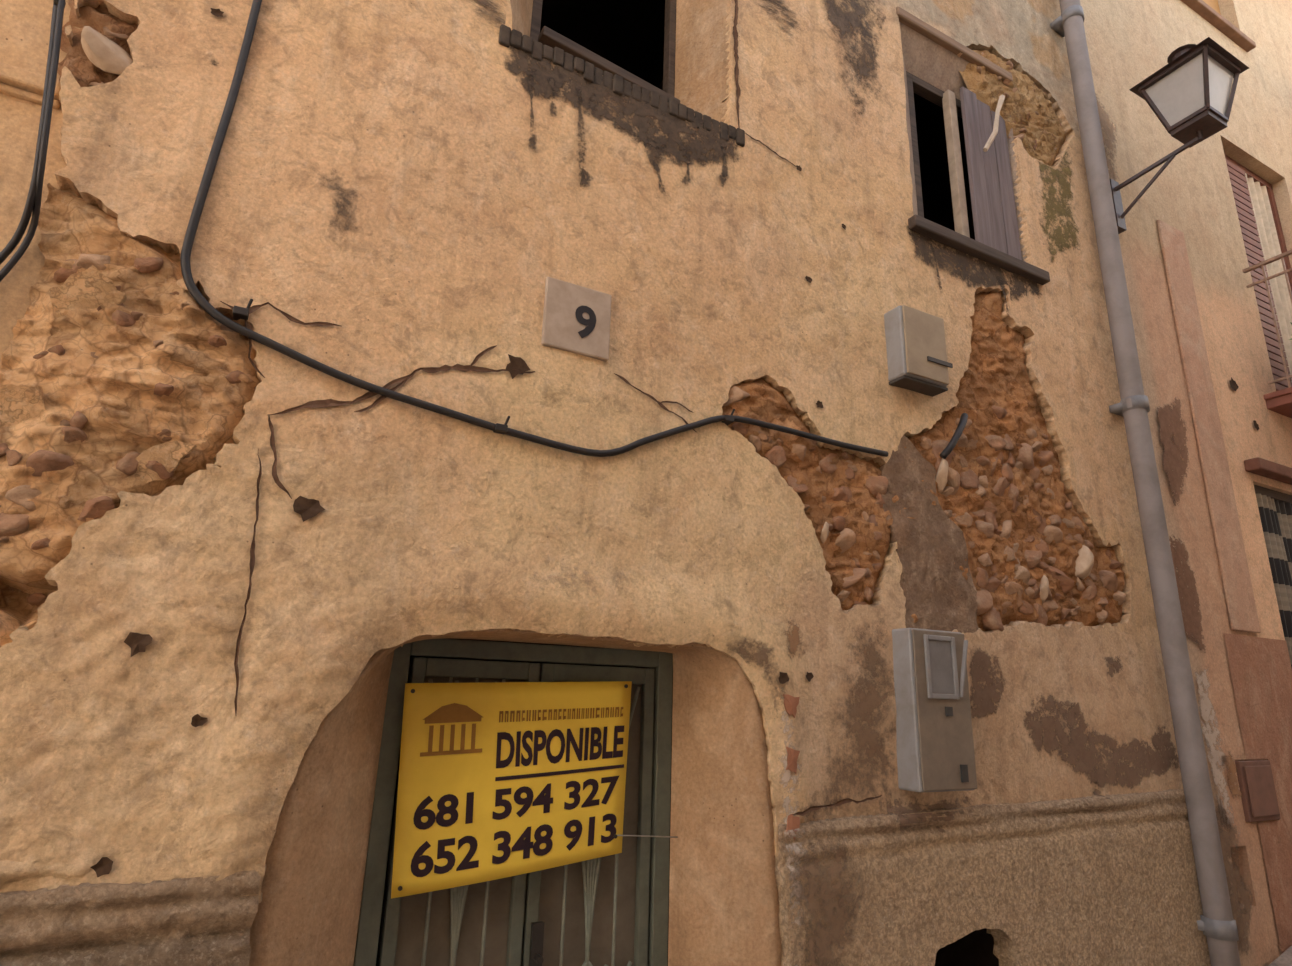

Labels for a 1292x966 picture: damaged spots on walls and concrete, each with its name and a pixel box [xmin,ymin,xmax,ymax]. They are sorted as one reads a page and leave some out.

flaking render [57,0,138,87]
leakage [474,0,739,193]
leakage [762,0,797,31]
leakage [825,0,886,115]
flaking render [960,50,1066,166]
crack [220,301,341,378]
flaking render [0,183,261,648]
crack [234,345,535,714]
flaking render [722,378,915,610]
flaking render [905,291,1126,632]
peeling [785,620,805,658]
leakage [1017,695,1179,799]